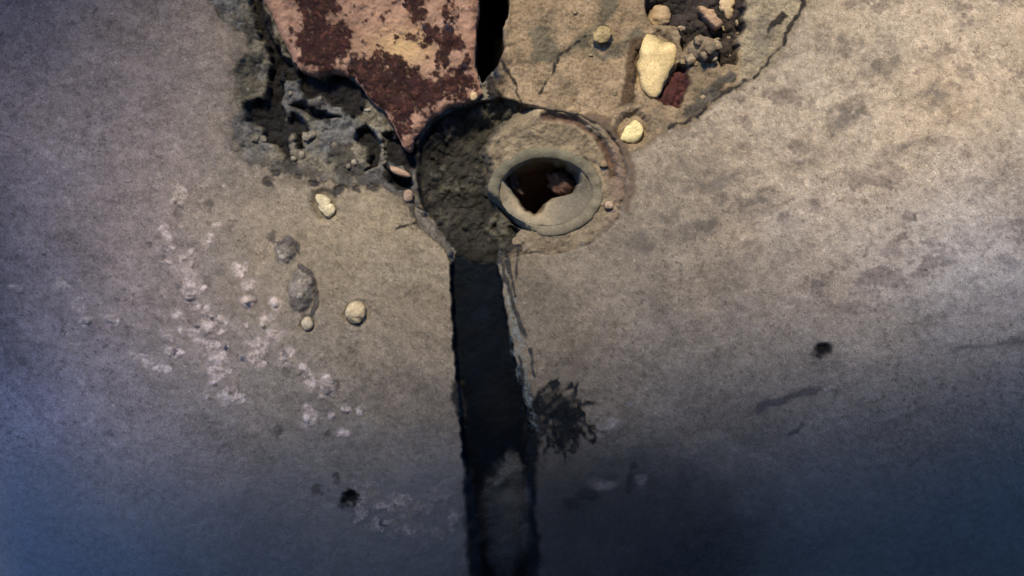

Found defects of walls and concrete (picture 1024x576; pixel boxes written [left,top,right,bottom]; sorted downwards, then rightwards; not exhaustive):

corrosion [288,0,478,139]
spalling [209,0,804,219]
efflorescence [129,222,246,407]
efflorescence [232,262,362,438]
water stain [450,246,599,576]